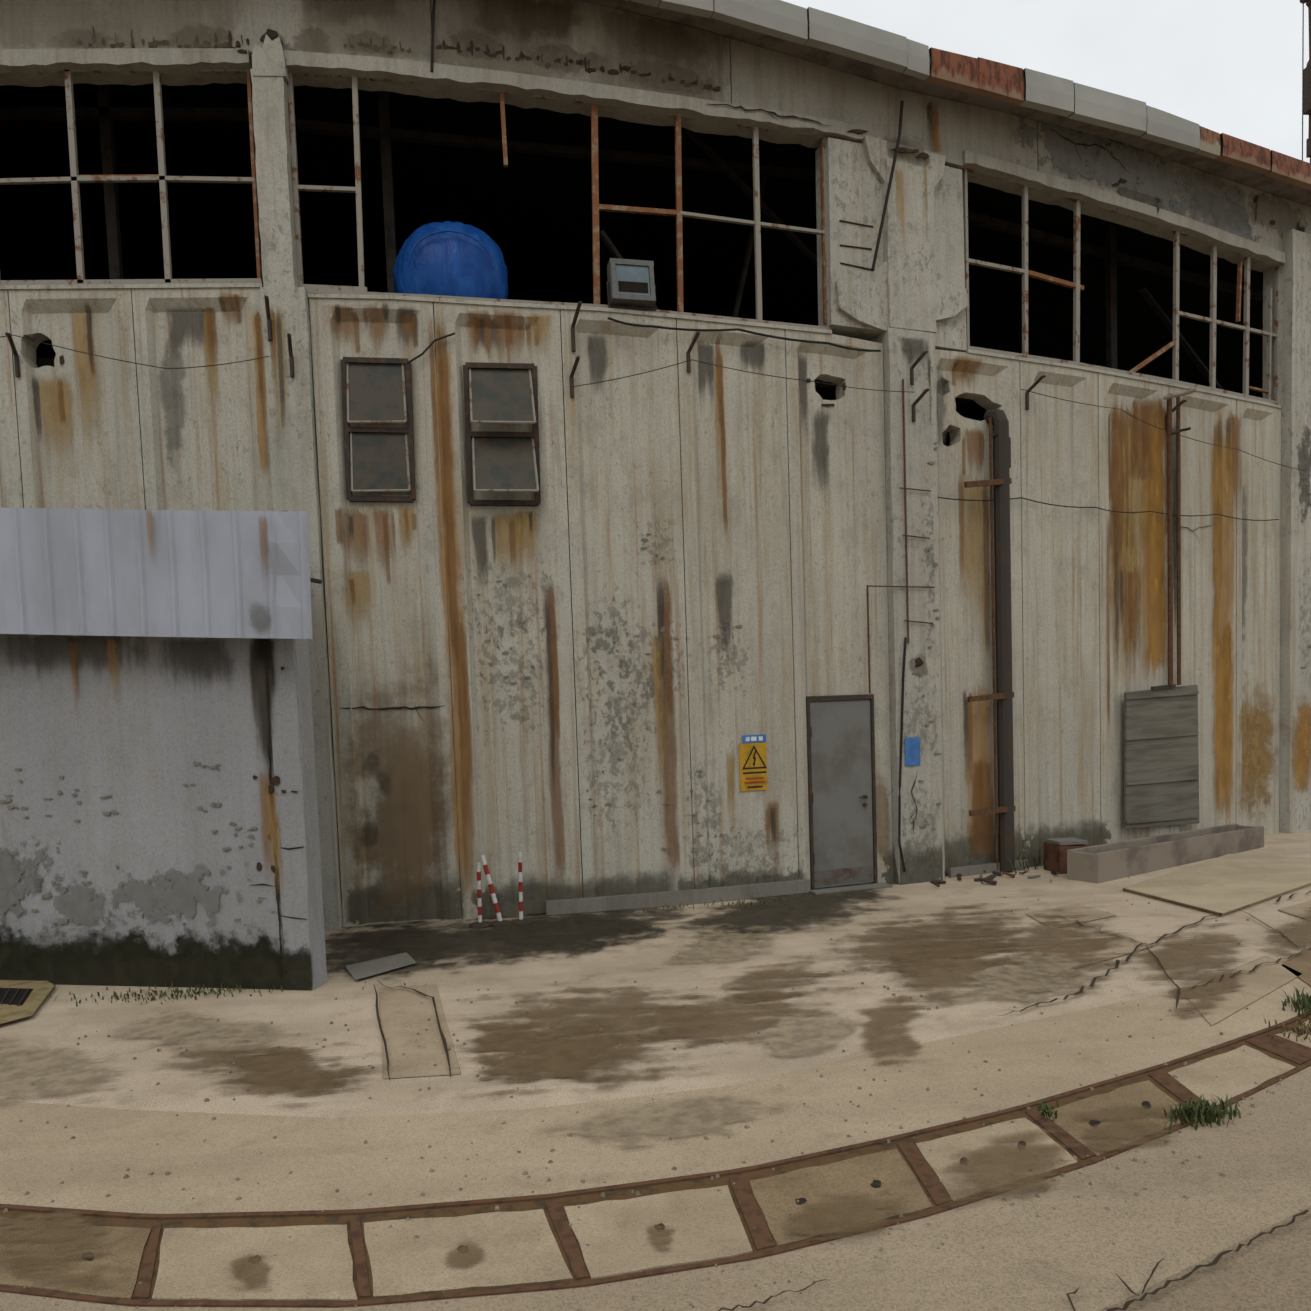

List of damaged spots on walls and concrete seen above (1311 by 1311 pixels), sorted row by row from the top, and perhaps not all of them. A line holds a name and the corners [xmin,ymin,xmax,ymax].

peeling [0,768,82,822]
spalling [252,775,298,794]
peeling [0,822,276,933]